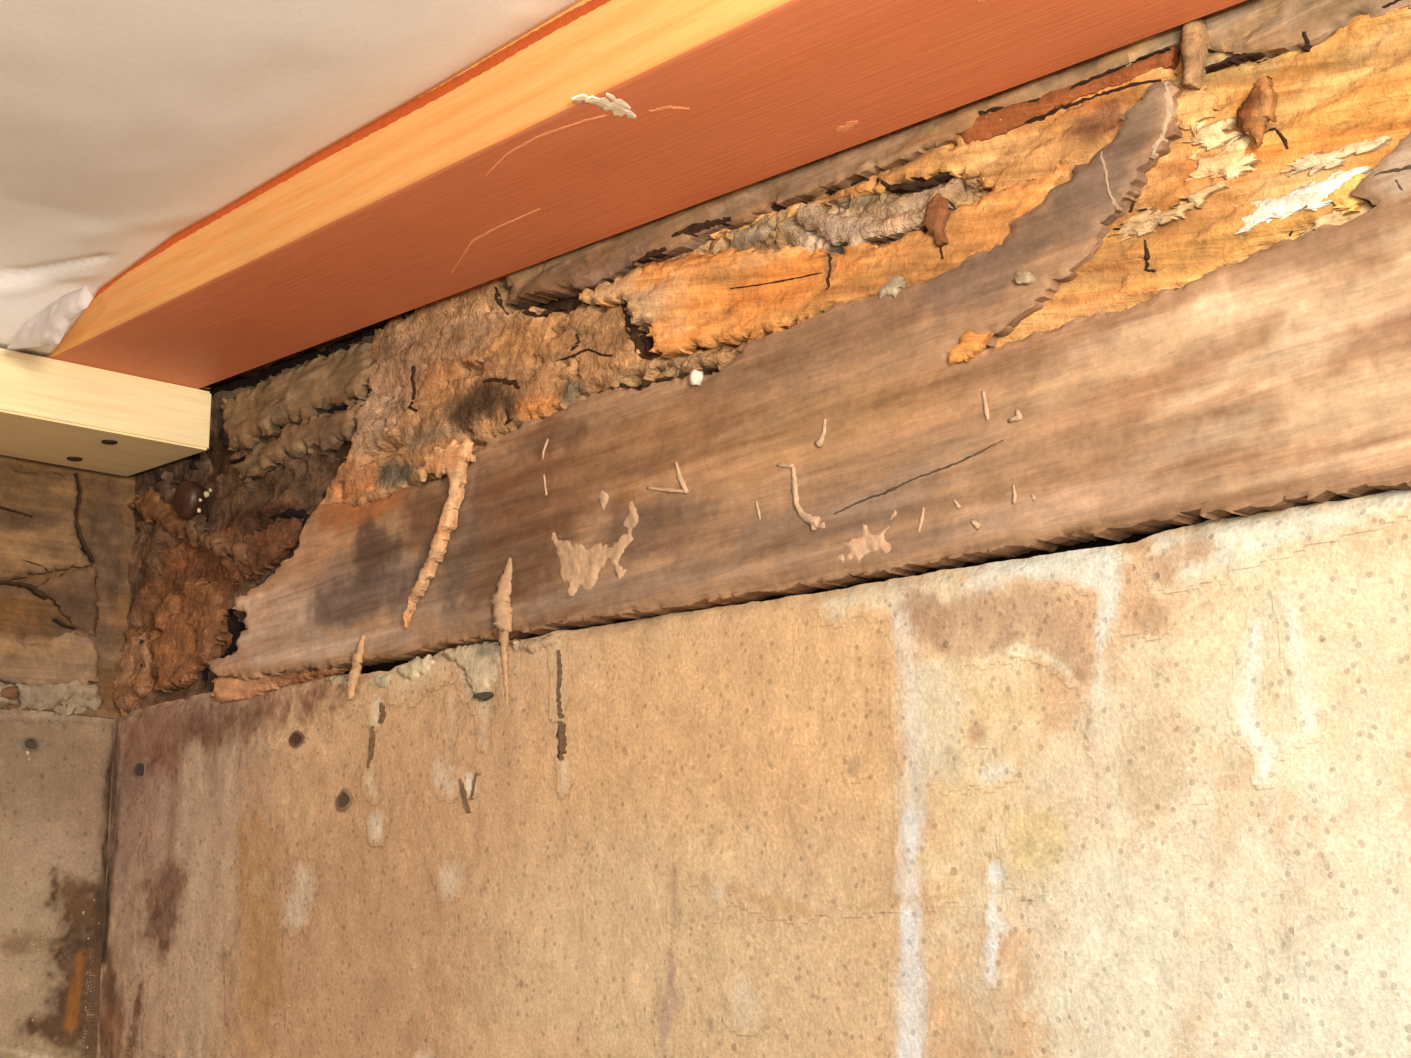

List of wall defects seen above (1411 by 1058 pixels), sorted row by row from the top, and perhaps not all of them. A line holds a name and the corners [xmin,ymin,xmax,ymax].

peeling [1150,76,1220,160]
peeling [1237,76,1278,148]
spalling [1099,151,1122,212]
spalling [664,177,990,262]
peeling [879,276,907,299]
peeling [1014,269,1036,285]
peeling [948,329,994,365]
spalling [326,675,348,689]
spalling [367,634,558,718]
water stain [651,489,1411,1058]